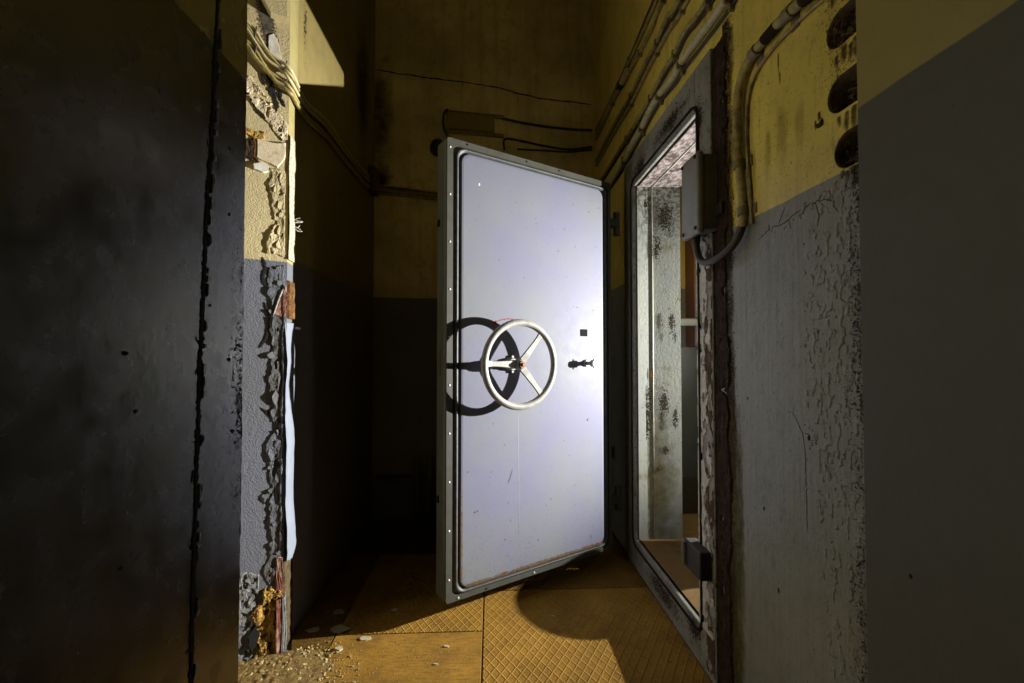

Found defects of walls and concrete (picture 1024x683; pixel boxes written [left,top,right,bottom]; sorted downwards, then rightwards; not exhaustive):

crack [186,0,284,683]
flaking render [238,72,303,662]
corrosion [287,280,295,320]
crack [375,69,593,105]
corrosion [630,12,744,683]
crack [759,190,836,239]
peeling [796,229,829,499]